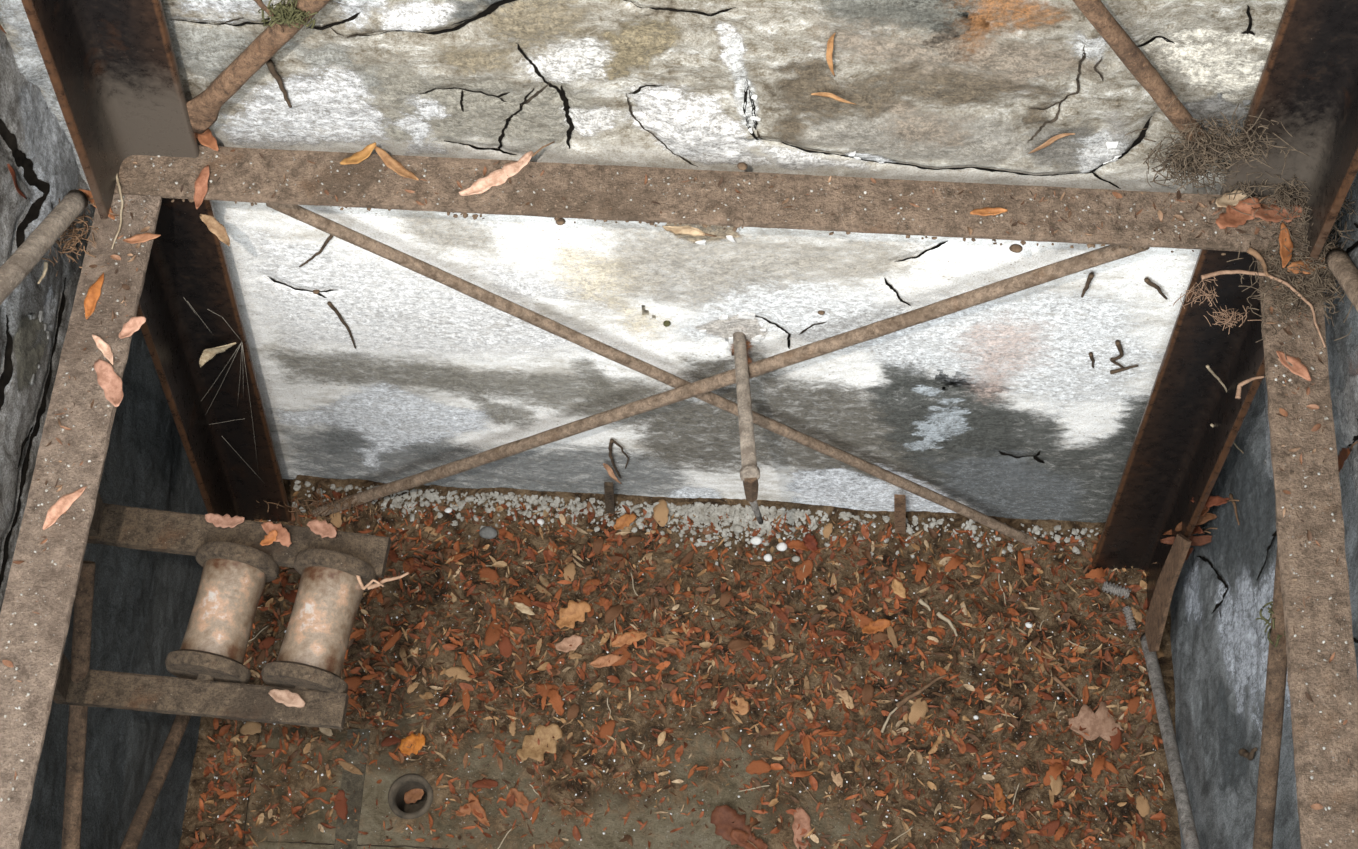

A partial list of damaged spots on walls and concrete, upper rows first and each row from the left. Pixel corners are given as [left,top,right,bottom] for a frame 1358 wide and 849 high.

leakage [170,0,276,79]
crack [306,0,516,38]
crack [420,43,574,155]
crack [626,85,698,167]
leakage [222,0,1129,170]
crack [624,0,736,16]
crack [743,45,1152,189]
crack [0,119,50,249]
leakage [406,211,488,251]
crack [1346,223,1358,253]
leakage [235,221,1163,523]
crack [0,277,66,587]